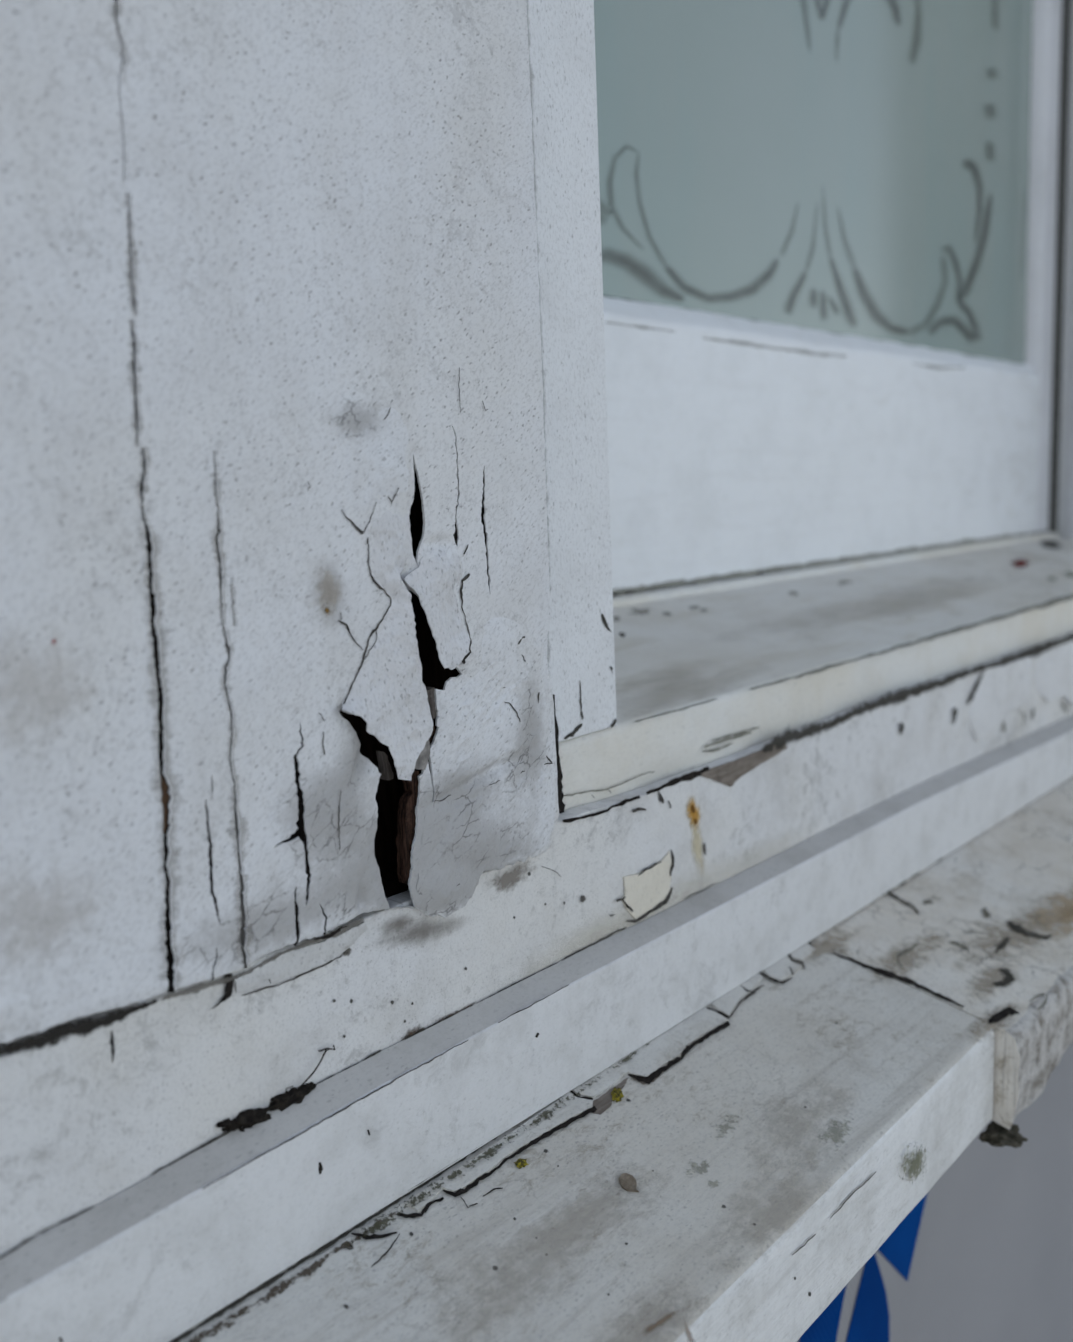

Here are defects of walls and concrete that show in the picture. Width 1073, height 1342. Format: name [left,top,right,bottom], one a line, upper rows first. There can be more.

crack [127,200,175,993]
crack [205,451,399,1009]
peeling [968,642,1073,742]
peeling [621,851,672,919]
rust [687,799,706,861]
peeling [405,943,815,1213]
crack [628,891,1052,1084]